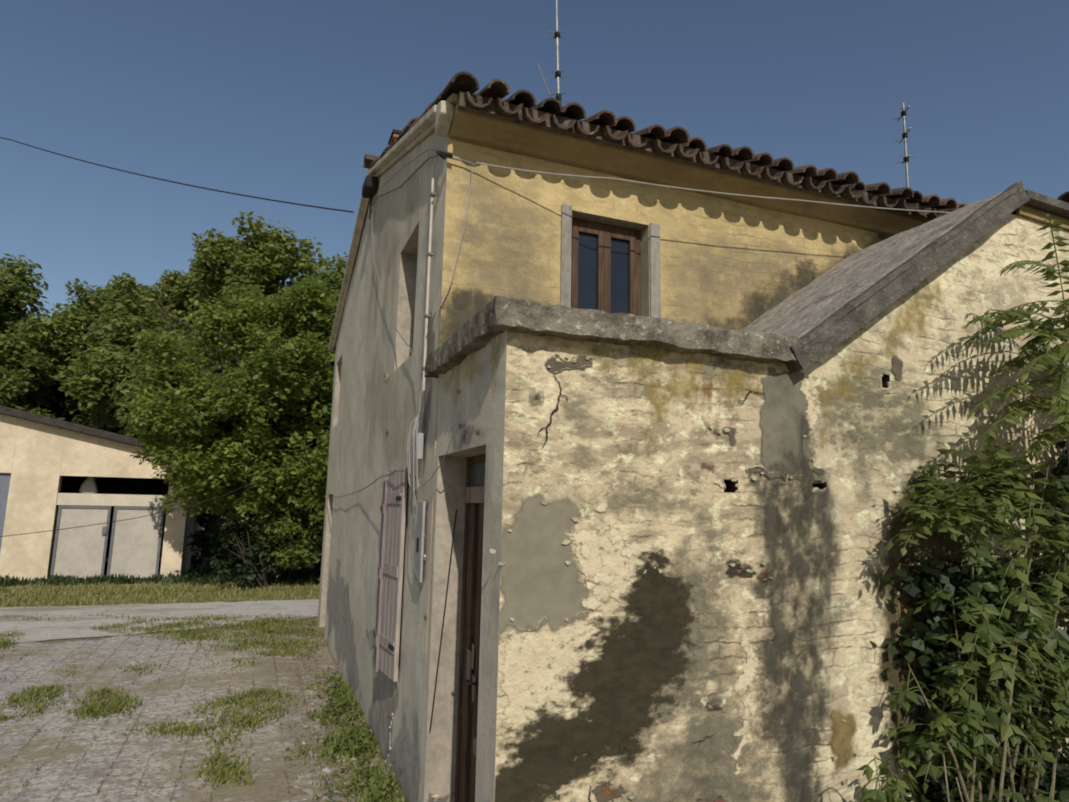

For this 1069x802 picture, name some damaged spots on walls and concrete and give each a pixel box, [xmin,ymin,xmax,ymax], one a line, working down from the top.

damp [440,291,487,344]
flaking render [545,352,593,374]
spalling [881,356,903,390]
crack [537,373,568,448]
flaking render [708,425,736,446]
spalling [746,381,827,491]
spalling [701,463,740,494]
flaking render [489,494,663,634]
damp [495,367,972,802]
flaking render [726,559,772,582]
flaking render [589,779,634,802]